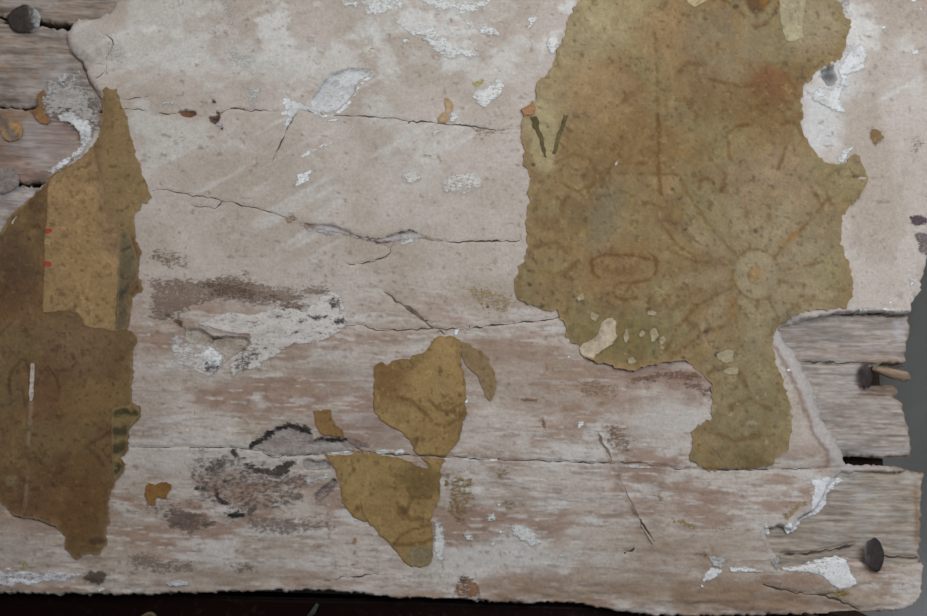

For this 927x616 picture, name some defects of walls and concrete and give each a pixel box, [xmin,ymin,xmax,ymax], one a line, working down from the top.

spalling [39,66,102,173]
spalling [280,68,373,127]
crack [272,110,505,161]
crack [153,189,290,219]
crack [446,237,520,245]
spalling [910,215,927,255]
peeling [168,291,349,377]
leakage [146,440,335,538]
spalling [248,422,405,503]
spalling [784,477,846,534]
leakage [126,553,193,574]
peeling [772,555,857,589]